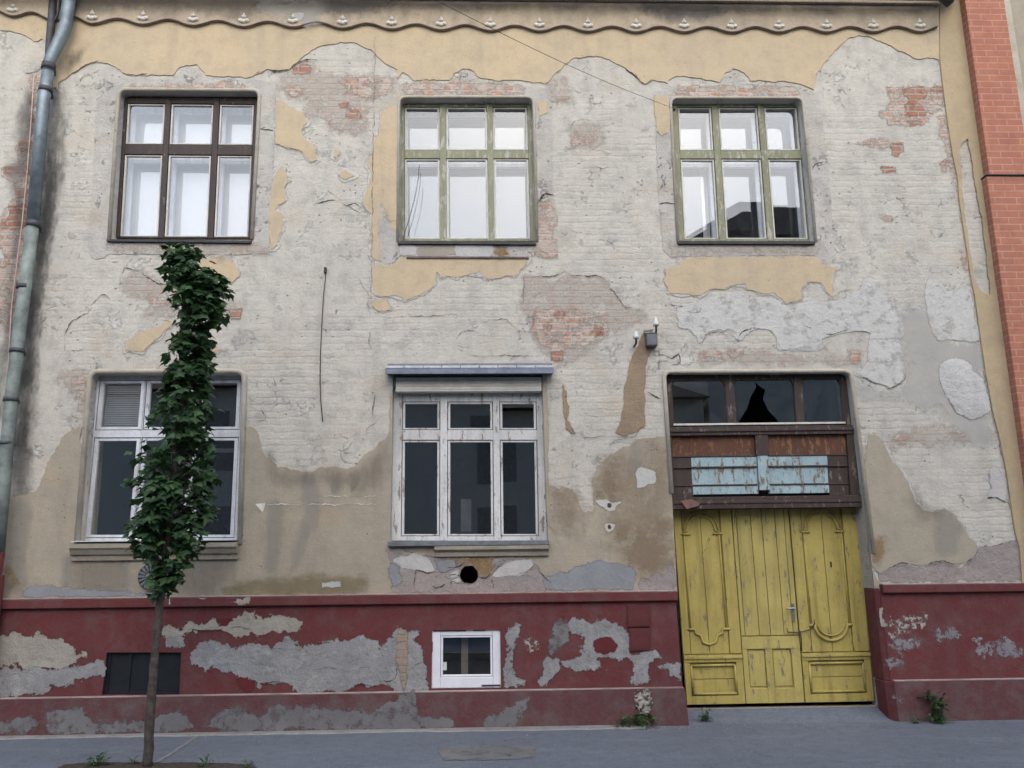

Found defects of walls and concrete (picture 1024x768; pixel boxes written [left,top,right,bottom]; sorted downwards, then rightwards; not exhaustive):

flaking render [10,36,1021,584]
flaking render [388,547,546,593]
peeling [0,630,107,697]
peeling [161,596,455,732]
peeling [483,617,683,727]
peeling [879,607,960,669]
peeling [972,636,1023,658]